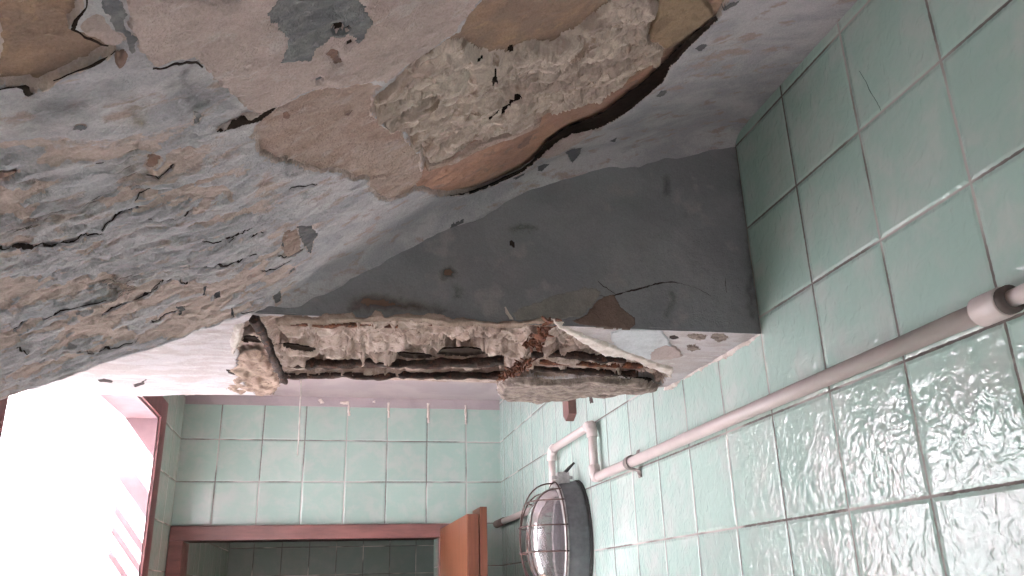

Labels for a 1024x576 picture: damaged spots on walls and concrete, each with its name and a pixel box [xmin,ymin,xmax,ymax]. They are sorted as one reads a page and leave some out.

crack [153,61,203,70]
flaking render [0,0,740,198]
crack [501,96,522,114]
crack [0,164,193,253]
crack [13,229,303,356]
crack [598,278,727,297]
spalling [226,295,728,404]